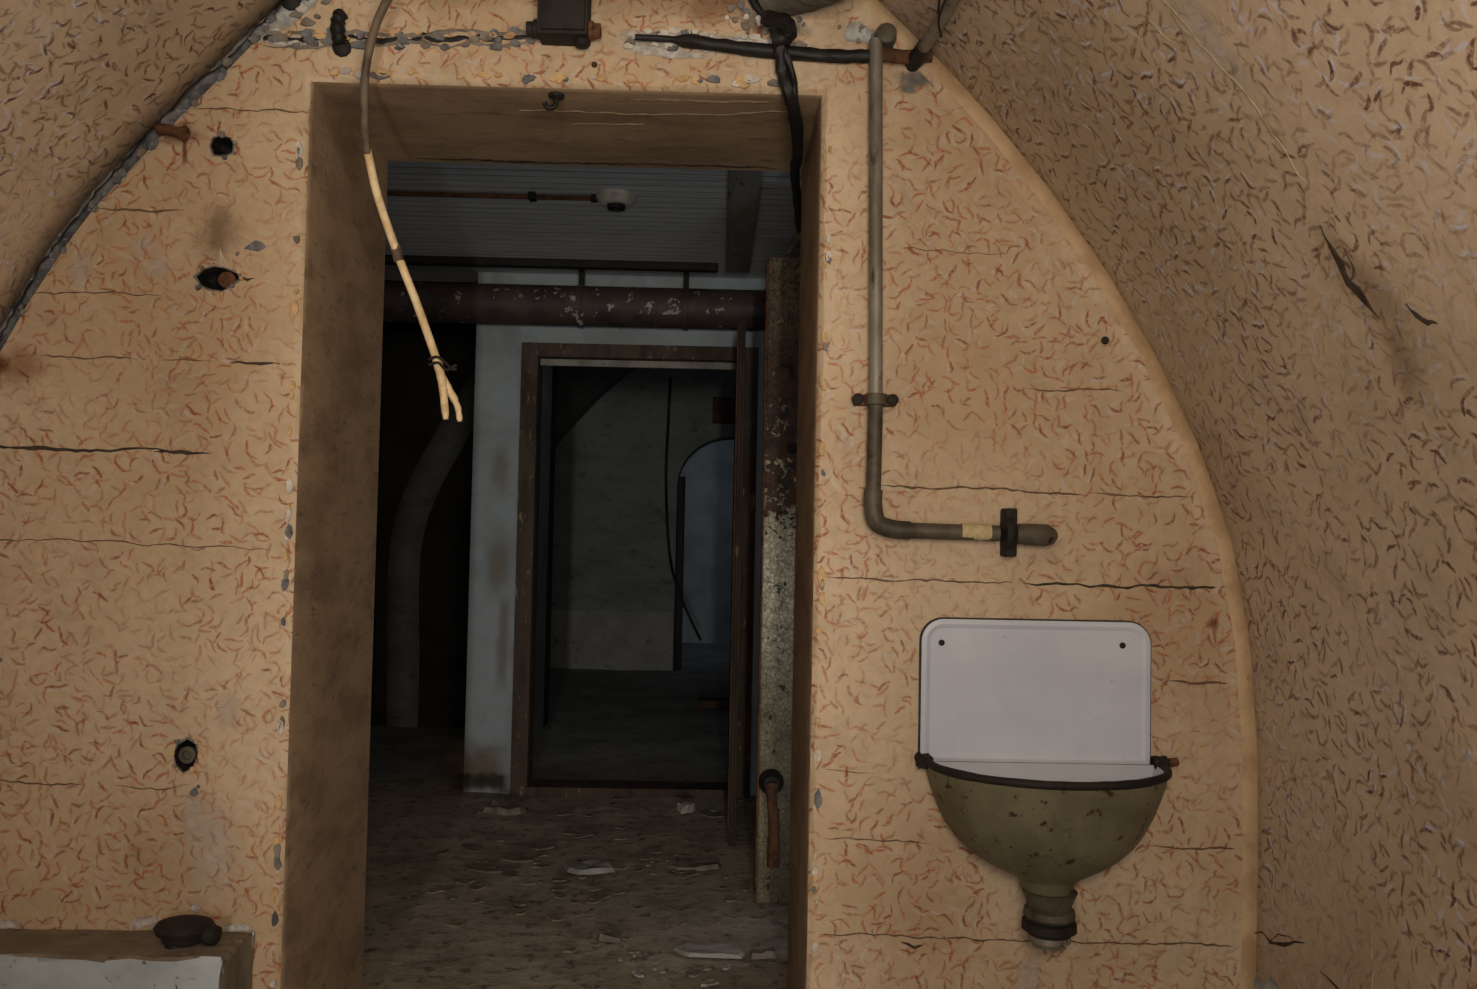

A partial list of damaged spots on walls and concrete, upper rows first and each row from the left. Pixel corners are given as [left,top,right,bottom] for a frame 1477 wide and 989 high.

crack [0,0,309,352]
crack [1320,225,1437,326]
crack [40,354,280,366]
crack [0,445,210,455]
crack [882,485,1192,498]
crack [0,534,268,550]
crack [0,779,80,787]
crack [116,783,188,791]